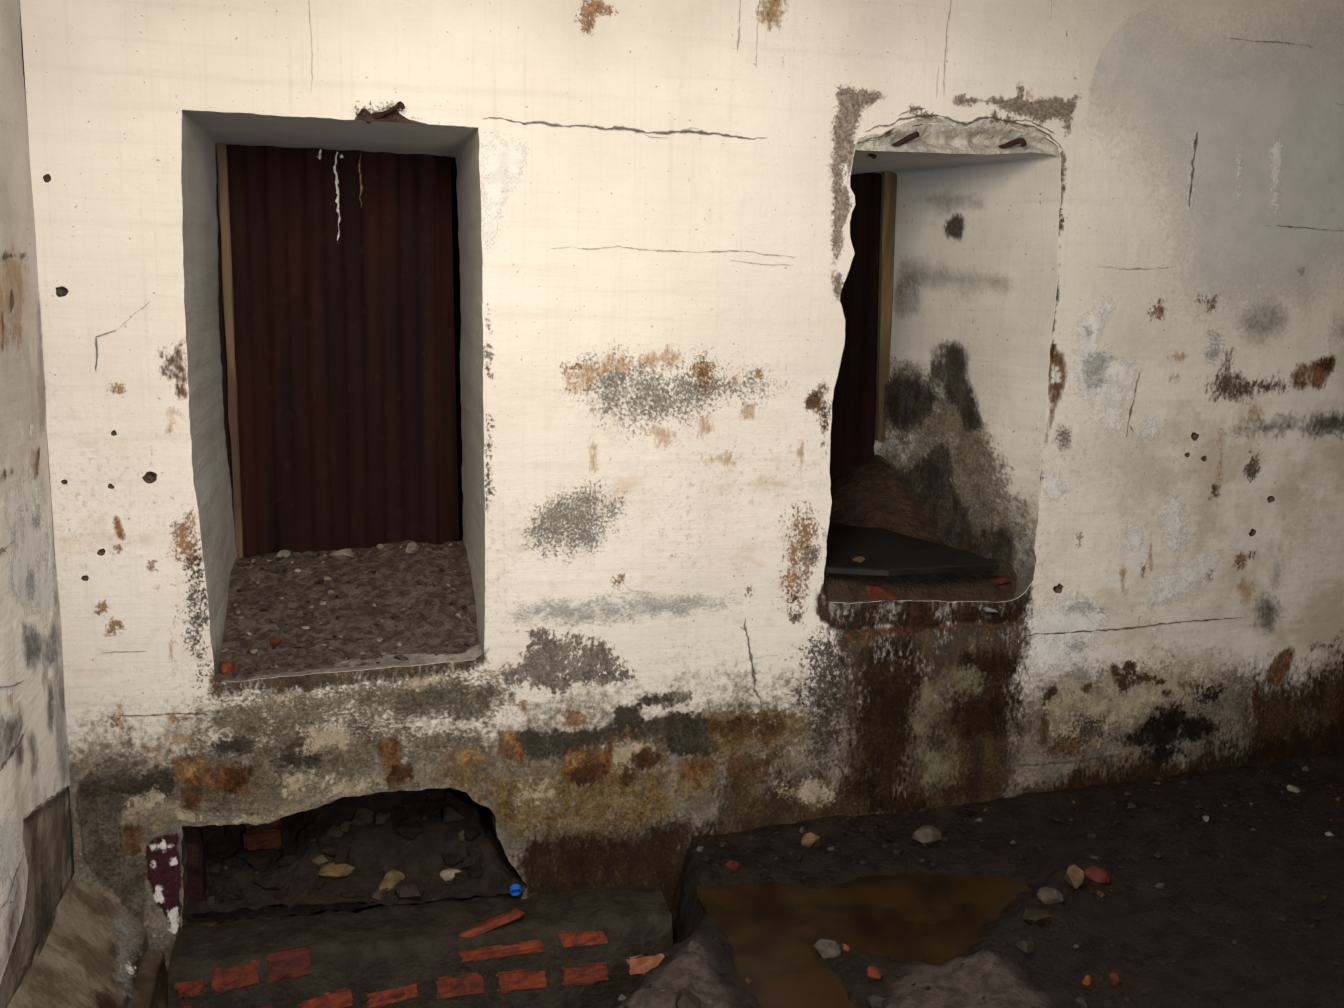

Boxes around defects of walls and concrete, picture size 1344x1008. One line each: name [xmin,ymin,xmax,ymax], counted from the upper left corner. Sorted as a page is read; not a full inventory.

rust [575,0,617,36]
crack [485,117,756,140]
spalling [831,85,1078,297]
peeling [1092,20,1344,298]
rust [644,352,716,394]
rust [1206,348,1335,414]
leakage [878,341,1029,564]
rust [1243,451,1261,482]
leakage [519,483,624,564]
rust [778,502,824,624]
crack [1023,617,1240,636]
leakage [95,538,1344,913]